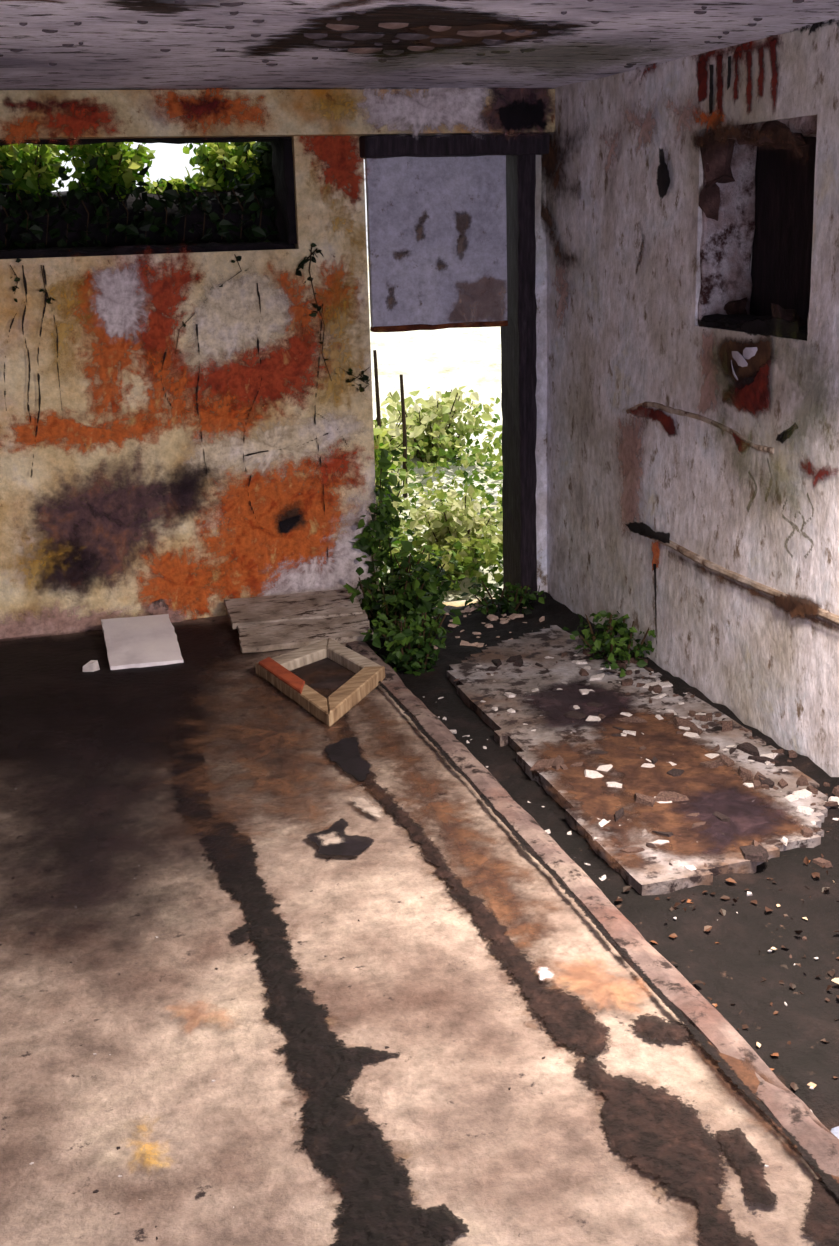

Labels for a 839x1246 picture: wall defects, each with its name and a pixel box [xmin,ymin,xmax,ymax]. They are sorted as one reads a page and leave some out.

peeling [102,0,243,29]
rust [154,88,266,134]
peeling [216,0,599,66]
rust [629,63,657,84]
rust [666,35,781,131]
spalling [693,119,808,221]
rust [1,251,363,453]
spalling [697,297,806,417]
rust [137,439,370,620]
water stain [0,451,557,973]
water stain [560,960,643,1011]